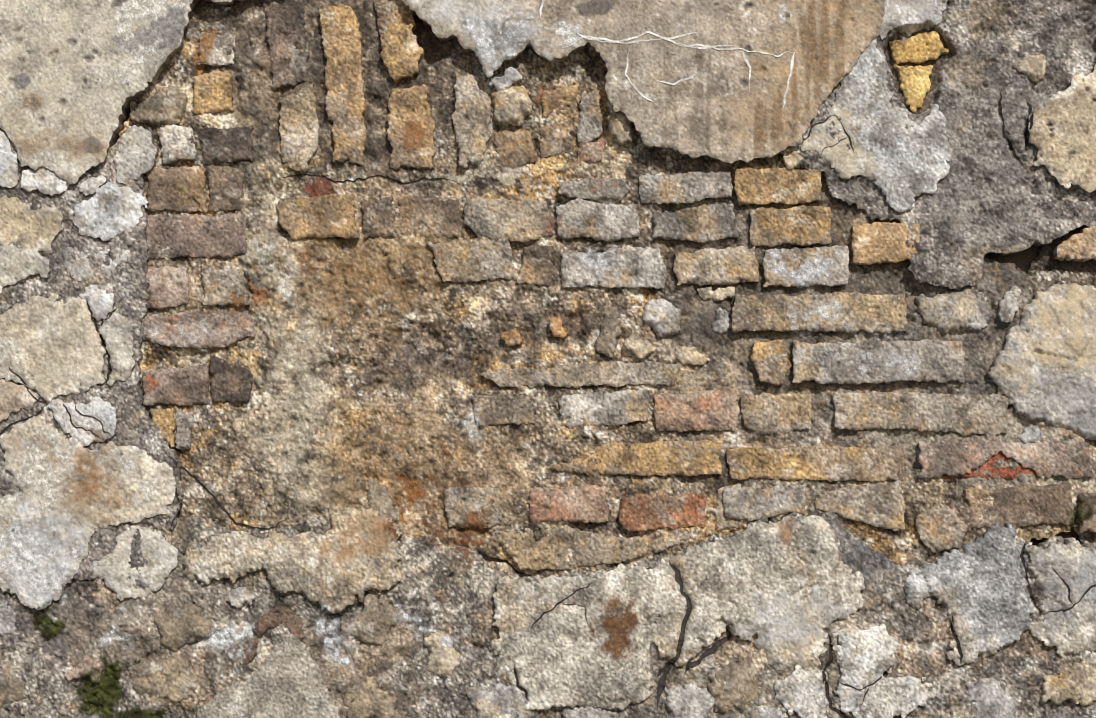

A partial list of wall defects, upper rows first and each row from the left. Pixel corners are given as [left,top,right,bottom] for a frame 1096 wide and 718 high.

spalling [112,0,1096,578]
crack [657,560,731,710]